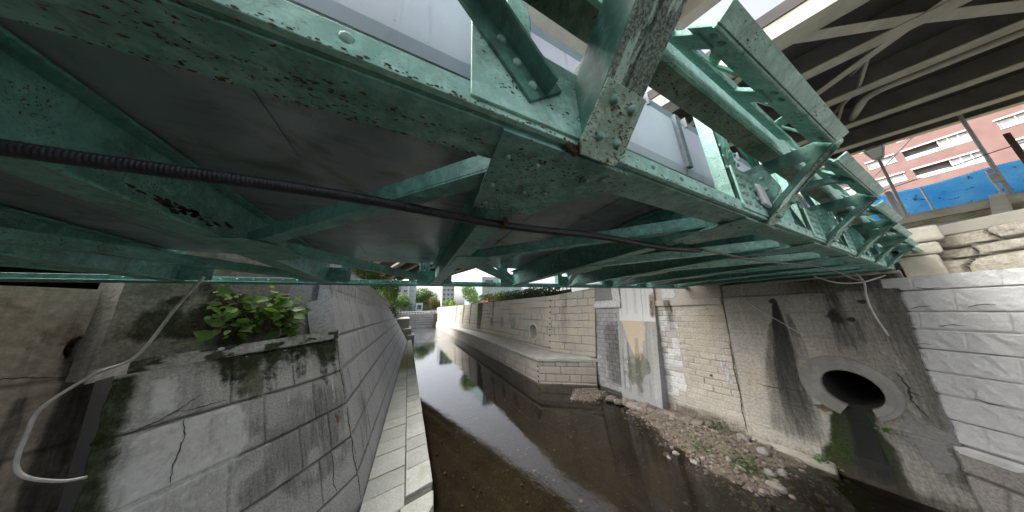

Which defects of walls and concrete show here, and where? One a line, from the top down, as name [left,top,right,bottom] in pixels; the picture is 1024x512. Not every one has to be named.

rust [307,36,504,116]
leakage [222,352,278,390]
leakage [292,342,336,398]
peeling [589,283,655,361]
leakage [767,302,812,416]
leakage [799,274,928,371]
crack [896,372,929,418]
crack [125,393,225,488]
leakage [836,406,965,512]